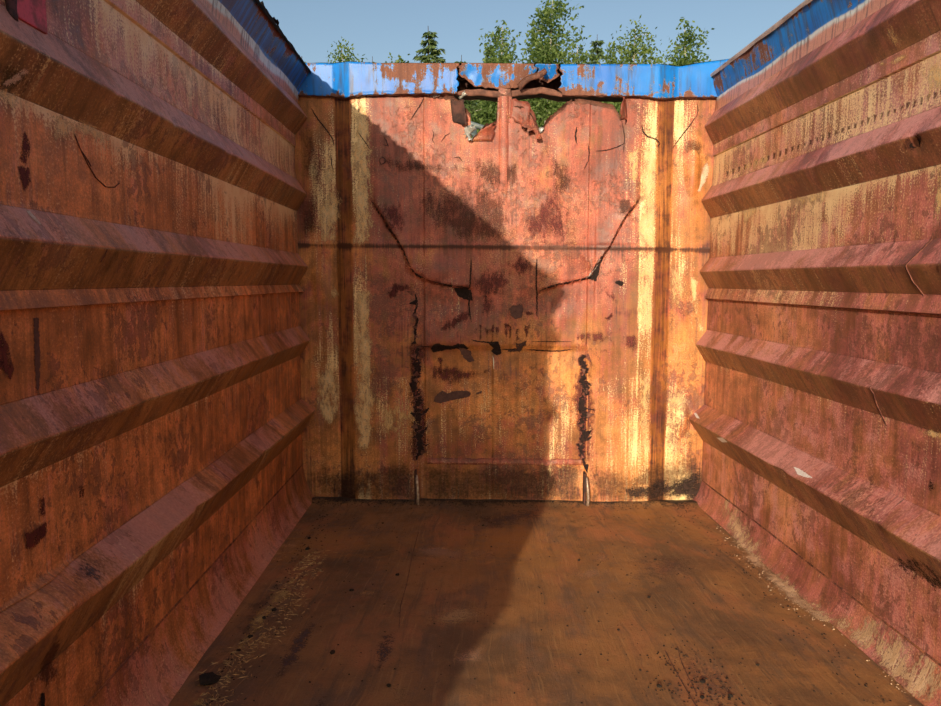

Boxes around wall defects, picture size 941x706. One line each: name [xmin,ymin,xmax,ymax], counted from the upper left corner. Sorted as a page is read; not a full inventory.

corrosion [18,133,31,191]
corrosion [513,256,532,275]
crack [535,200,637,314]
corrosion [474,269,530,343]
corrosion [0,332,14,379]
corrosion [33,317,41,390]
corrosion [433,358,489,386]
crack [372,202,595,472]
corrosion [577,332,606,344]
corrosion [25,496,47,550]
corrosion [896,554,941,594]
corrosion [39,643,59,706]